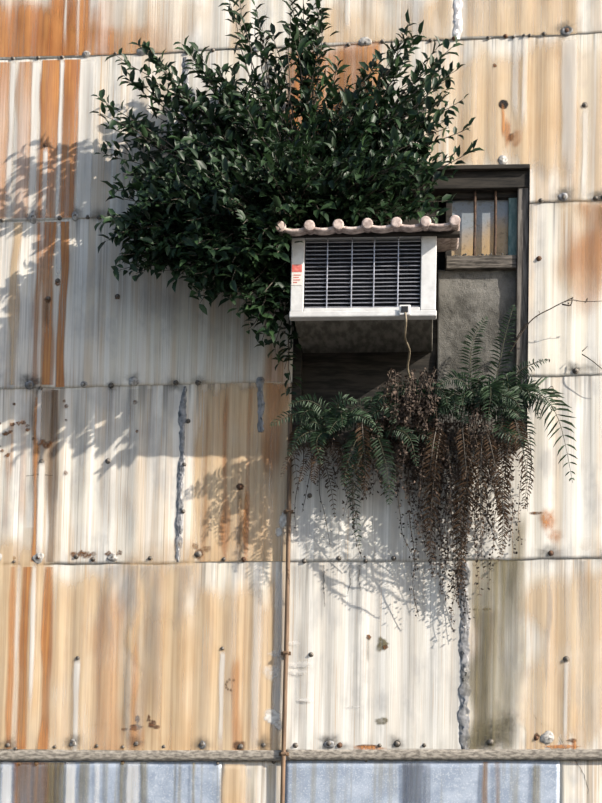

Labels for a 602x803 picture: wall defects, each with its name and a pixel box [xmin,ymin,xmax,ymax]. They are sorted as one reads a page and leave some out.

rust [474,0,574,36]
rust [463,46,572,169]
rust [0,0,289,750]
rust [15,762,64,803]